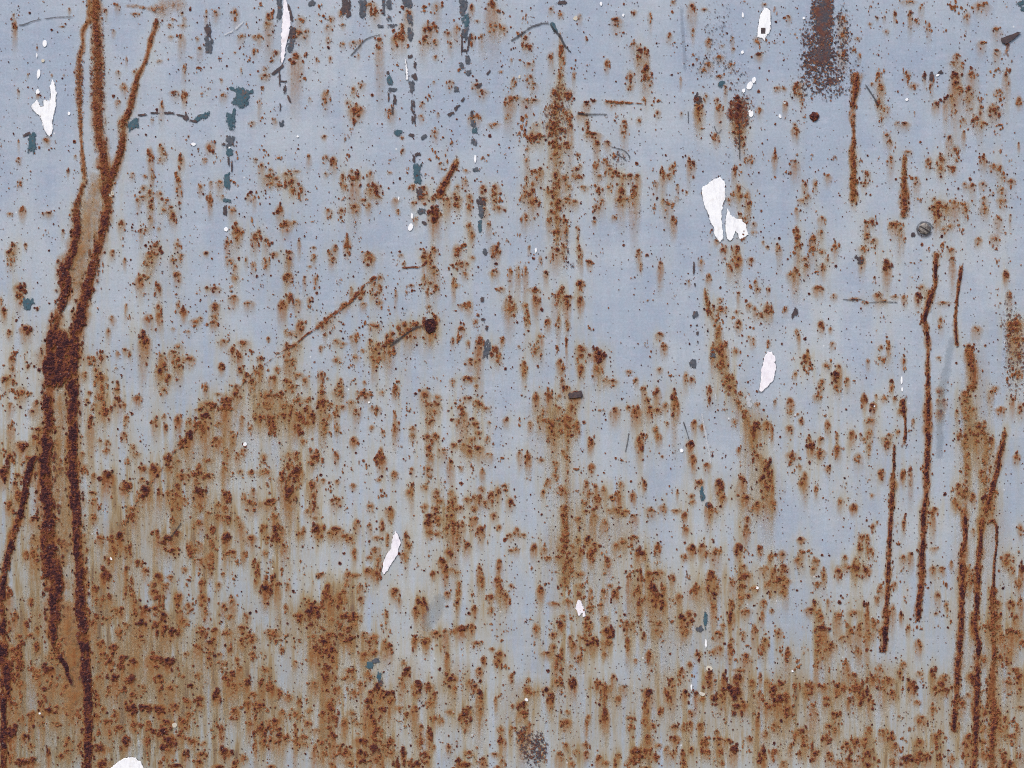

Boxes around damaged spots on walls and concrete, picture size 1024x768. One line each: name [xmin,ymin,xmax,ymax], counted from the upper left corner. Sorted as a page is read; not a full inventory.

peeling [757,8,771,41]
rust [834,0,947,58]
peeling [23,40,57,153]
rust [160,0,279,127]
peeling [272,0,296,126]
rust [844,45,927,243]
peeling [701,177,749,243]
rust [780,349,818,390]
rust [987,317,1024,422]
rust [669,440,726,471]
peeling [382,531,401,574]
peeling [111,757,143,768]